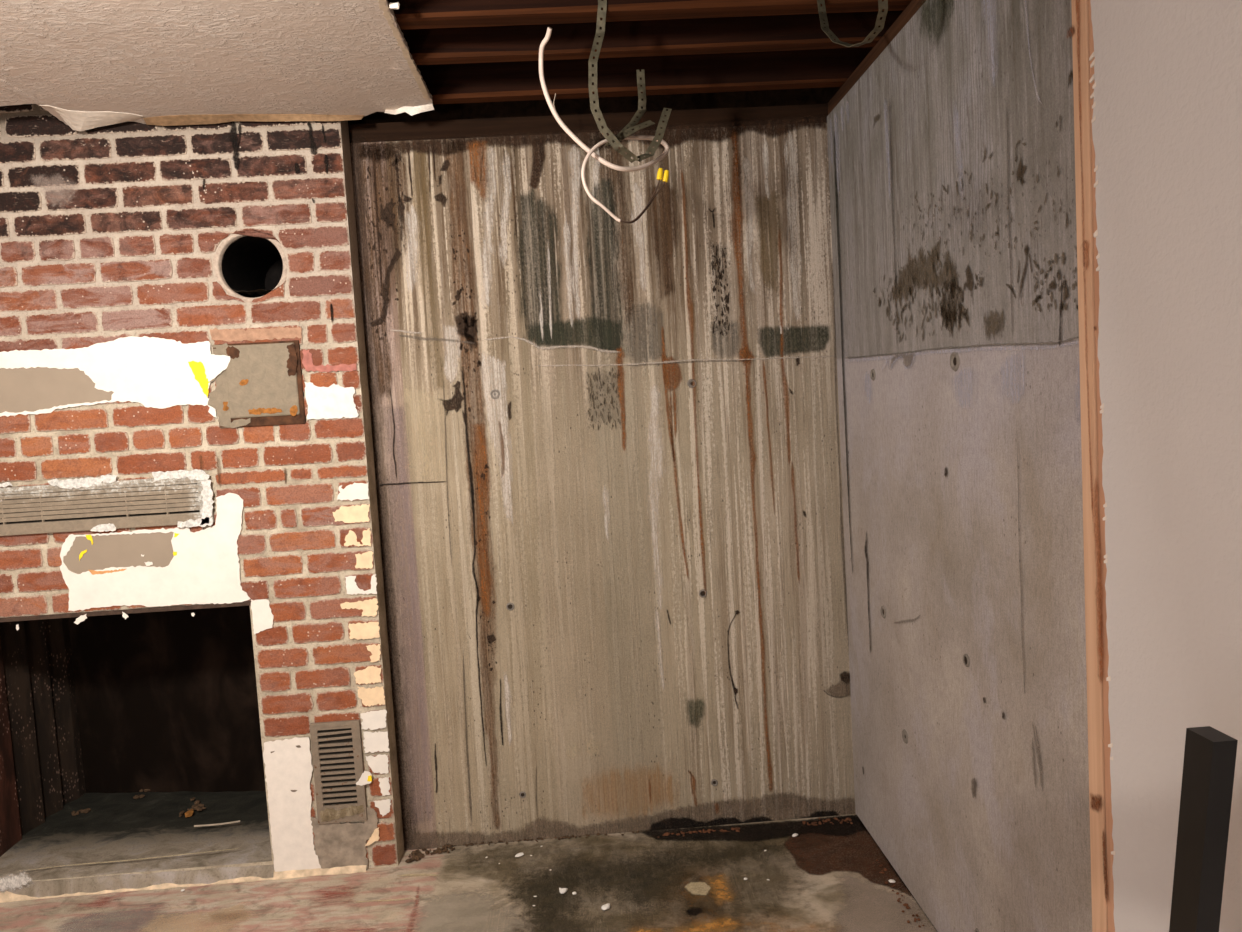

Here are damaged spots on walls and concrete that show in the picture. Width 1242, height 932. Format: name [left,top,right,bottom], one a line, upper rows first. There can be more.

peeling [0,336,240,418]
rust [248,405,298,416]
peeling [286,344,359,420]
rust [662,173,706,593]
peeling [60,493,274,635]
rust [447,143,500,828]
leakage [350,107,912,932]
peeling [333,482,391,846]
rust [636,873,816,932]